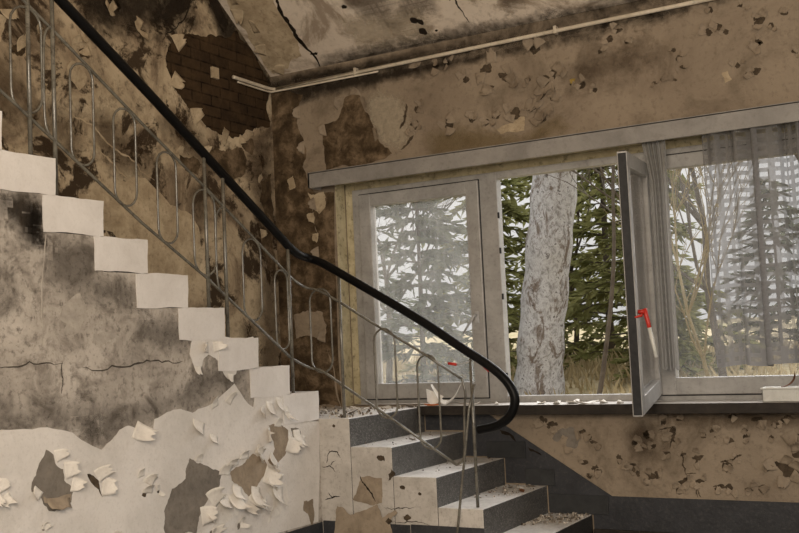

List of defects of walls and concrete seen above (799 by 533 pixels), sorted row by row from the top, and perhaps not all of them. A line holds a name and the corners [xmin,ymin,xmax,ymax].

crack [276,0,320,66]
peeling [697,2,729,36]
peeling [737,0,777,55]
peeling [430,48,567,126]
peeling [317,87,392,170]
leakage [1,193,43,245]
peeling [0,0,340,533]
crack [84,359,182,371]
peeling [616,414,706,495]
peeling [710,414,799,499]
peeling [334,469,411,533]